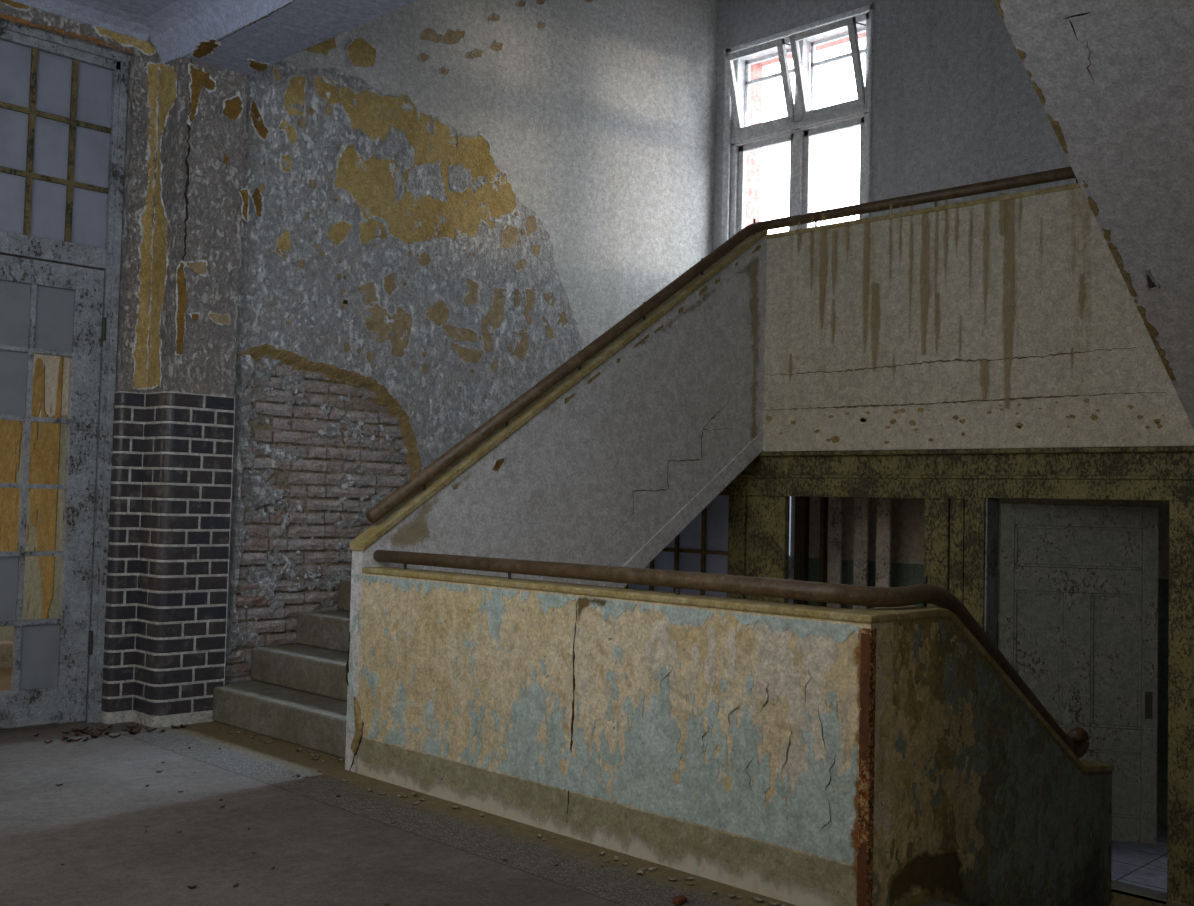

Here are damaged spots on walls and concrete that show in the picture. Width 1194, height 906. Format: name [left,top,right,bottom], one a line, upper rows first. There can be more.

crack [1064,12,1094,81]
crack [182,59,192,269]
water stain [798,213,849,340]
water stain [863,222,880,370]
water stain [889,193,1021,407]
peeling [94,26,859,865]
crack [608,403,734,541]
crack [569,603,577,750]
rust [855,630,870,762]
peeling [872,622,986,906]
rust [850,778,867,906]